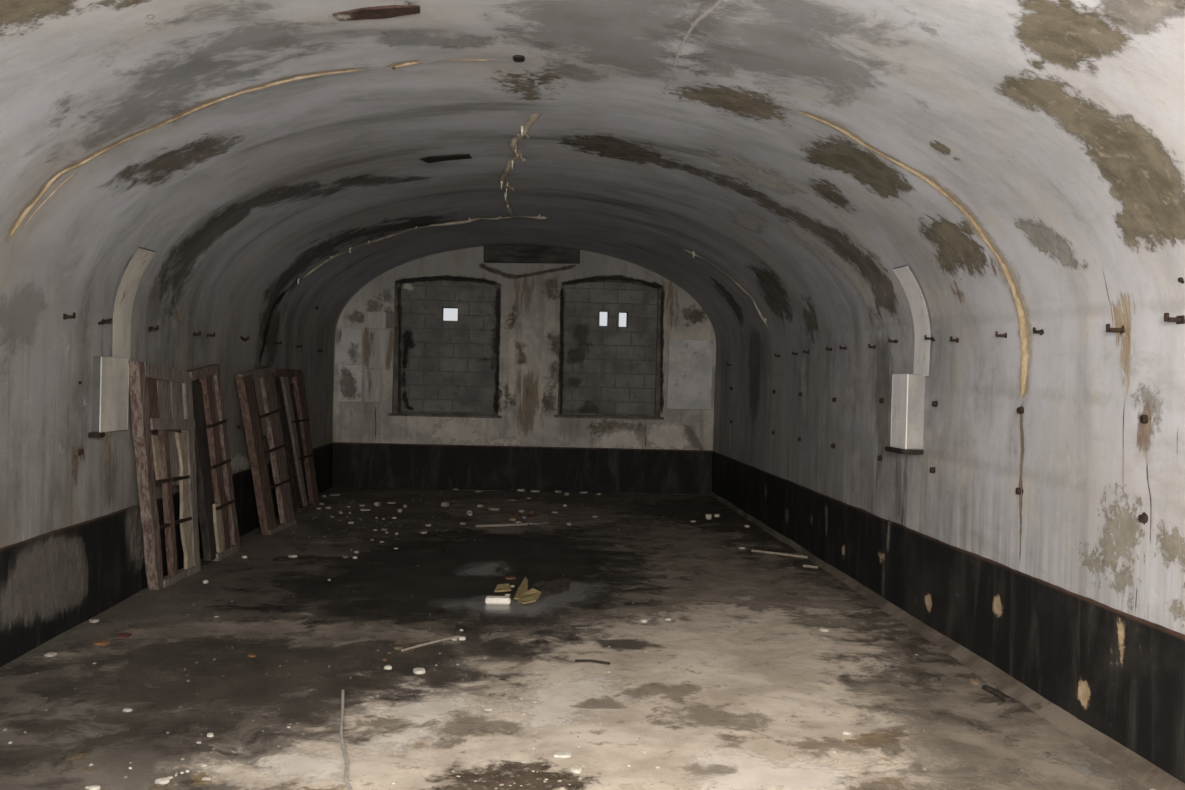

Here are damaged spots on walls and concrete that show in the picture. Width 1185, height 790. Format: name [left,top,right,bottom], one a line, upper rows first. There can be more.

crack [8,69,364,241]
peeling [663,82,790,126]
flaking render [799,134,913,211]
flaking render [998,0,1185,252]
crack [260,113,547,361]
damp [563,133,898,326]
flaking render [1015,220,1087,268]
damp [498,335,580,434]
damp [748,264,818,343]
crack [799,112,1029,559]
corrosion [1111,294,1135,393]
corrosion [1137,403,1154,454]